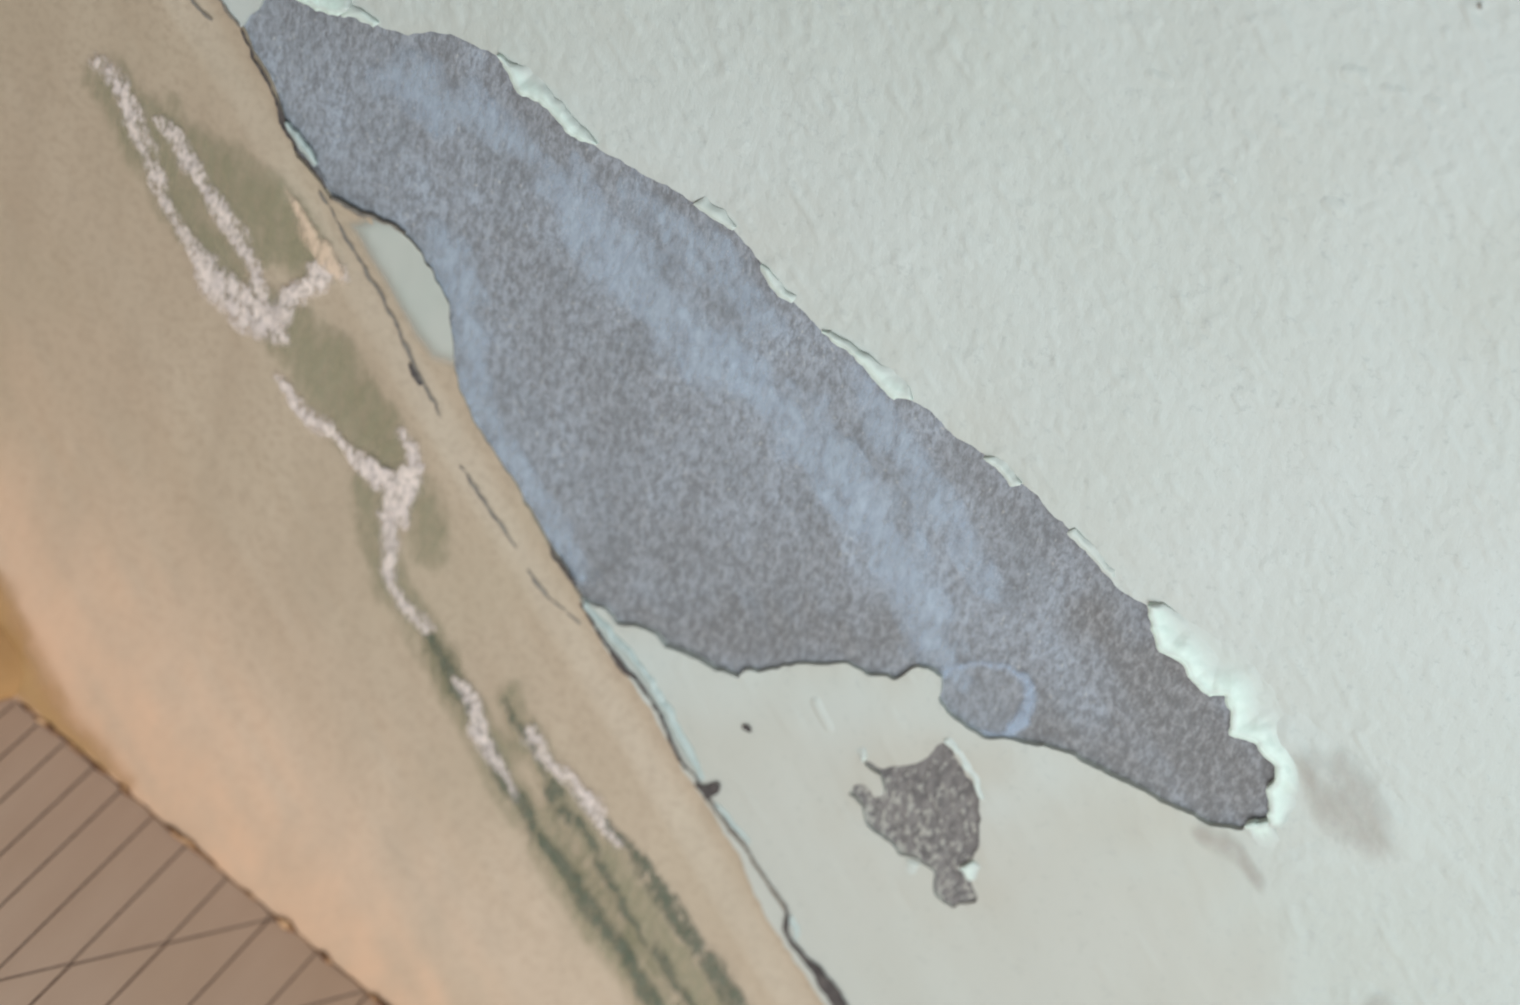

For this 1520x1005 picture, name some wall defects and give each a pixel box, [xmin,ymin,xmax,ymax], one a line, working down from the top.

damp [93,57,347,344]
damp [276,374,745,1005]
peeling [240,0,1299,848]
peeling [850,737,984,906]